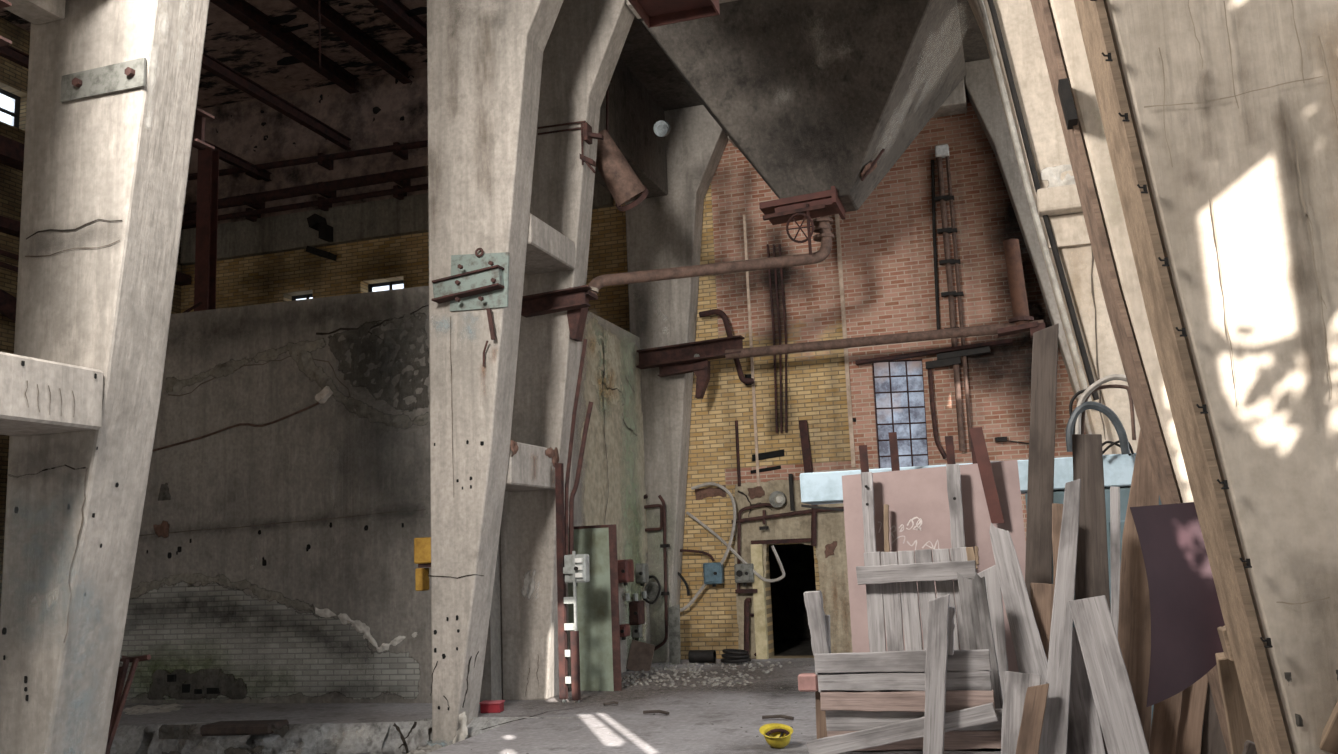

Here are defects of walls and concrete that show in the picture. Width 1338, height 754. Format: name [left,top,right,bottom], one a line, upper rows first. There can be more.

crack [25,219,122,257]
crack [168,305,454,491]
spalling [328,312,429,412]
spalling [153,521,192,559]
peeling [120,573,421,700]